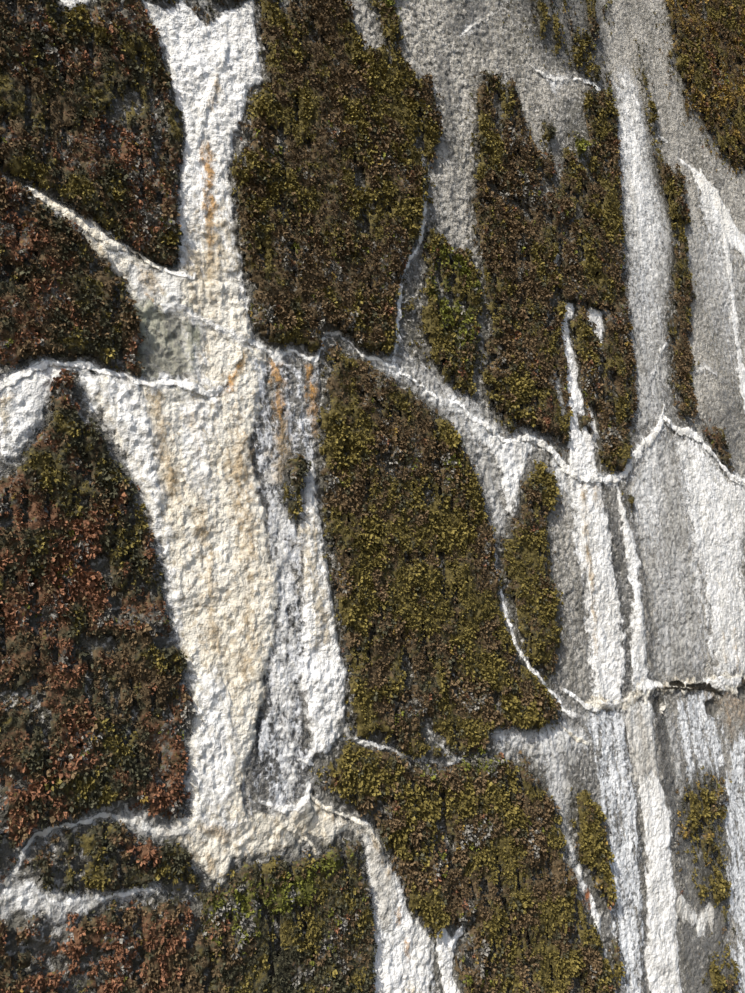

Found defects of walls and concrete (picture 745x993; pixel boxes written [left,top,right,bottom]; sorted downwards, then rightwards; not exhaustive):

damp [447,0,497,48]
corrosion [201,143,215,222]
crack [0,155,745,487]
damp [0,0,463,993]
damp [354,343,550,542]
damp [491,0,745,993]
crack [337,716,466,766]
crack [493,537,599,745]
crack [657,686,712,714]
crack [0,803,195,921]
crack [259,758,383,855]